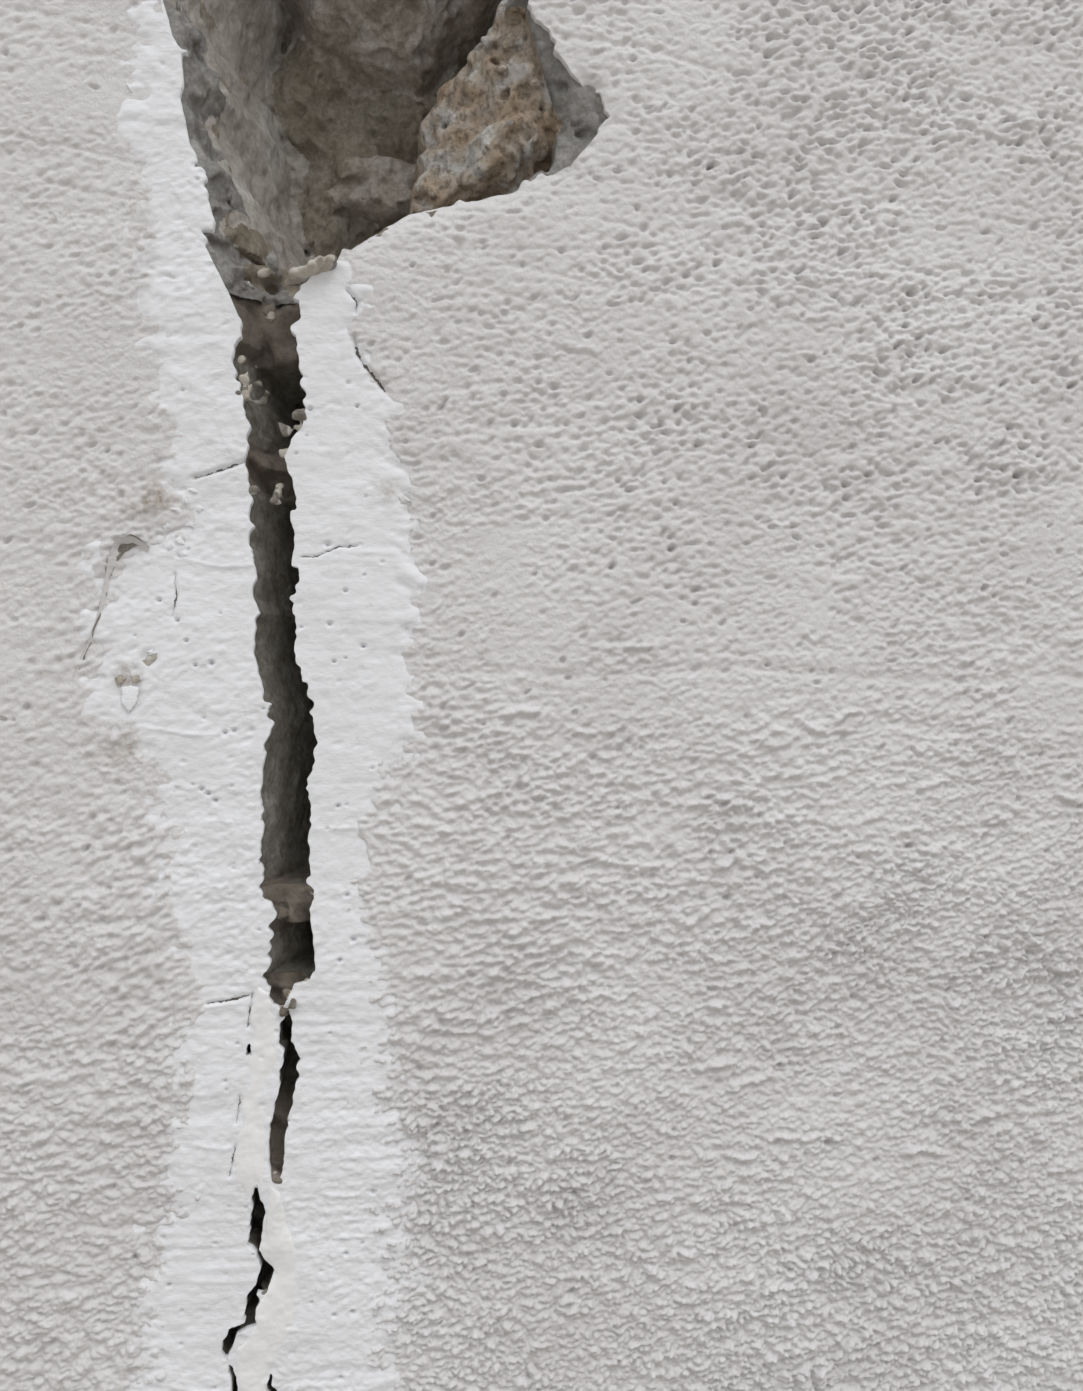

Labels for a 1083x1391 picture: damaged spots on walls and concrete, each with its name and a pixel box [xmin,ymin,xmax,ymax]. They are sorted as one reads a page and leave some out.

spalling [163,0,608,308]
crack [195,293,355,1391]